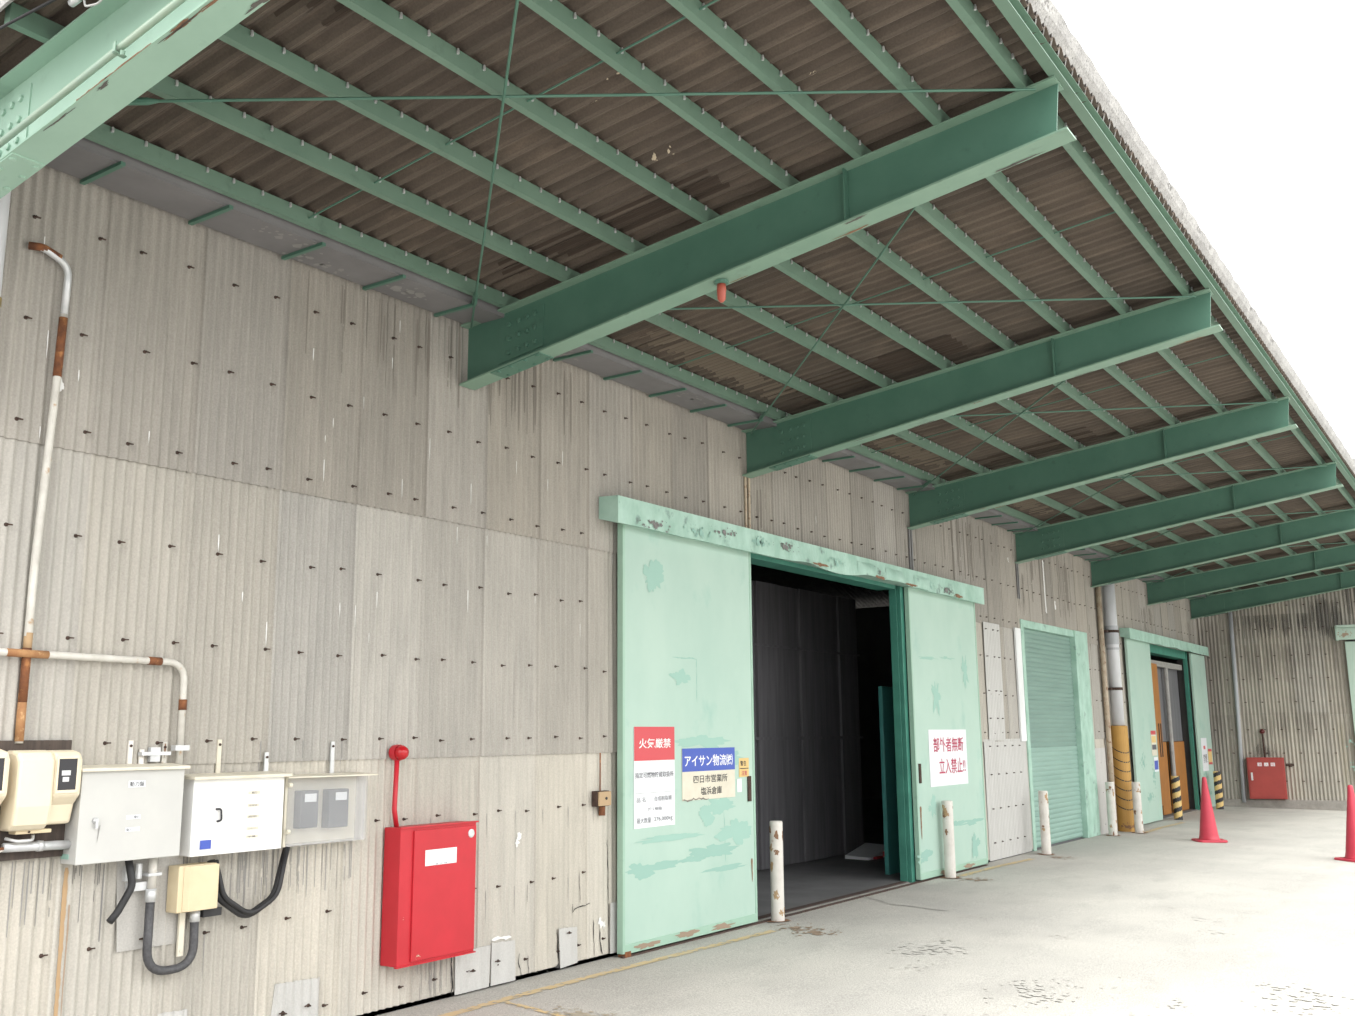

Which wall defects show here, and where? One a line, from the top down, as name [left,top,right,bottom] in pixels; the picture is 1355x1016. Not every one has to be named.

rust [7,632,50,741]
peeling [625,842,745,880]